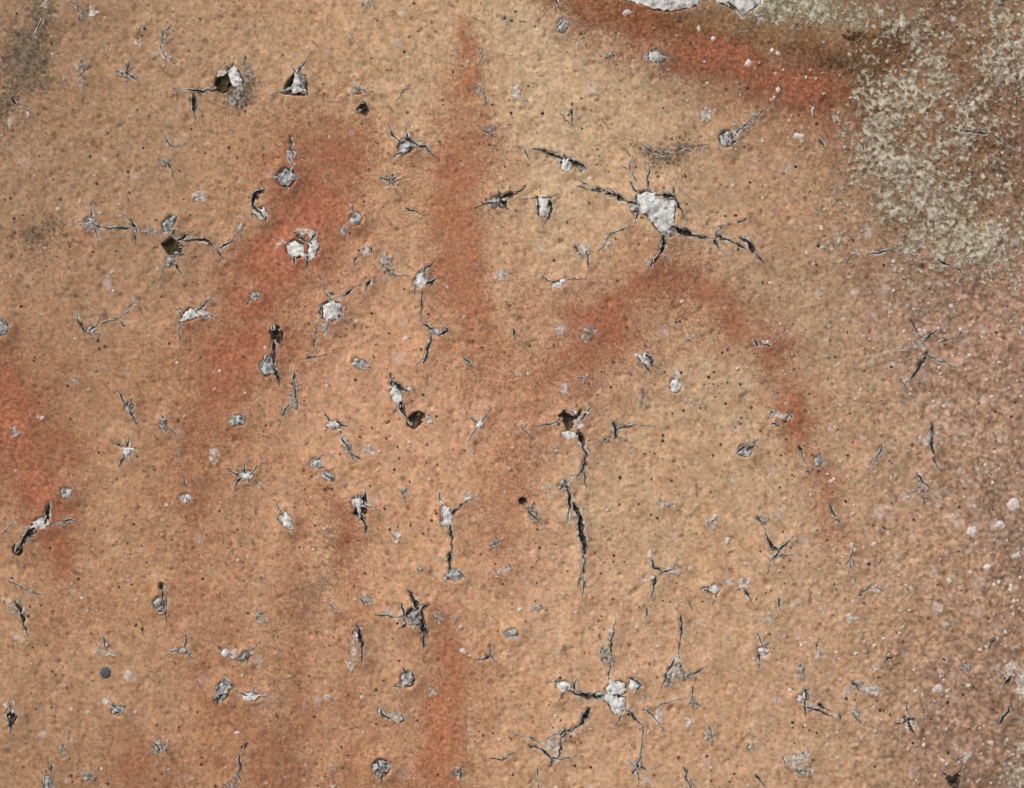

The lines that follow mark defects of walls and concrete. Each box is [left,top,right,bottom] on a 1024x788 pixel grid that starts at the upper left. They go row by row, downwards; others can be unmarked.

peeling [626,0,700,11]
corrosion [546,0,893,73]
peeling [715,0,760,19]
water stain [535,0,1024,338]
crack [257,320,300,428]
crack [389,372,413,426]
crack [467,407,492,443]
water stain [514,245,846,544]
crack [894,314,974,390]
crack [520,405,657,599]
crack [490,709,592,788]
crack [626,686,716,784]